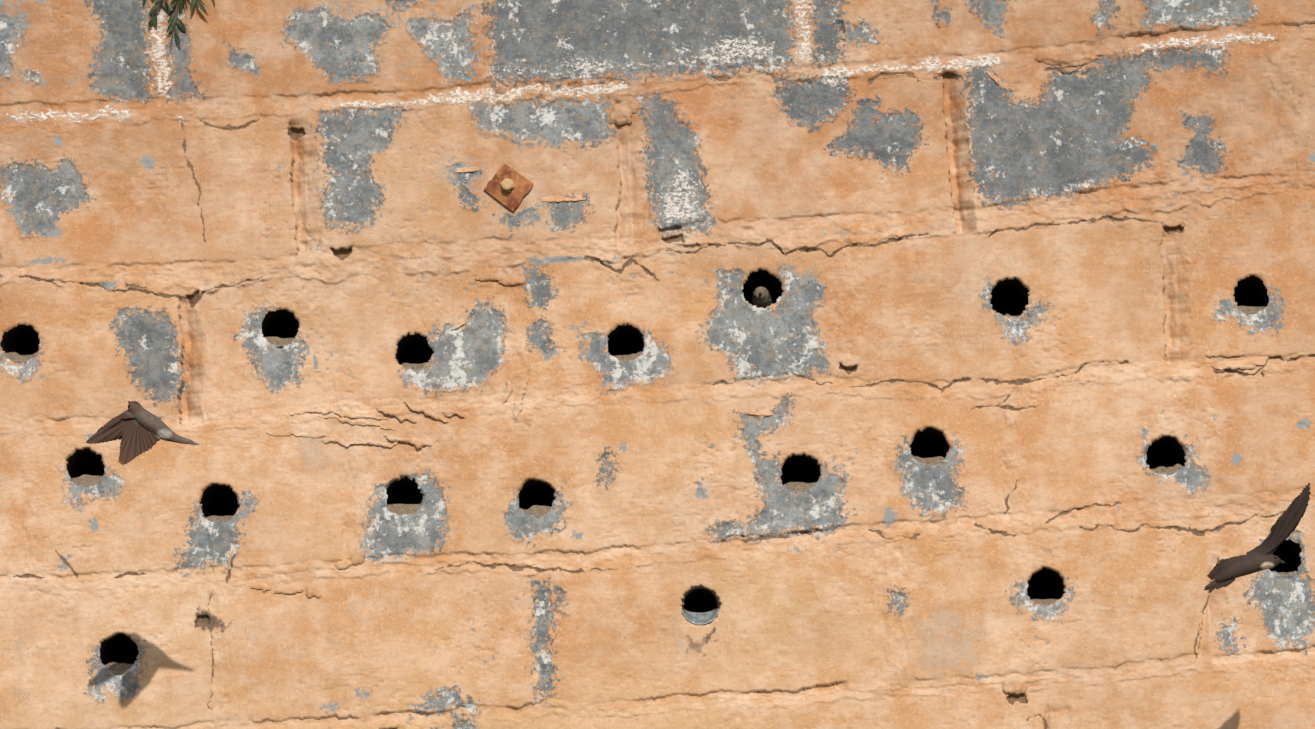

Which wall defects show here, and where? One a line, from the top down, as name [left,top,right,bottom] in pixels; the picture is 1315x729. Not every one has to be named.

peeling [0,0,48,88]
peeling [0,155,97,238]
peeling [84,0,207,106]
crack [179,119,259,243]
peeling [223,42,260,79]
peeling [280,0,929,260]
peeling [928,0,1017,39]
peeling [960,0,1259,211]
spalling [186,291,200,308]
peeling [109,306,189,409]
peeling [696,259,857,548]
peeling [523,575,570,703]